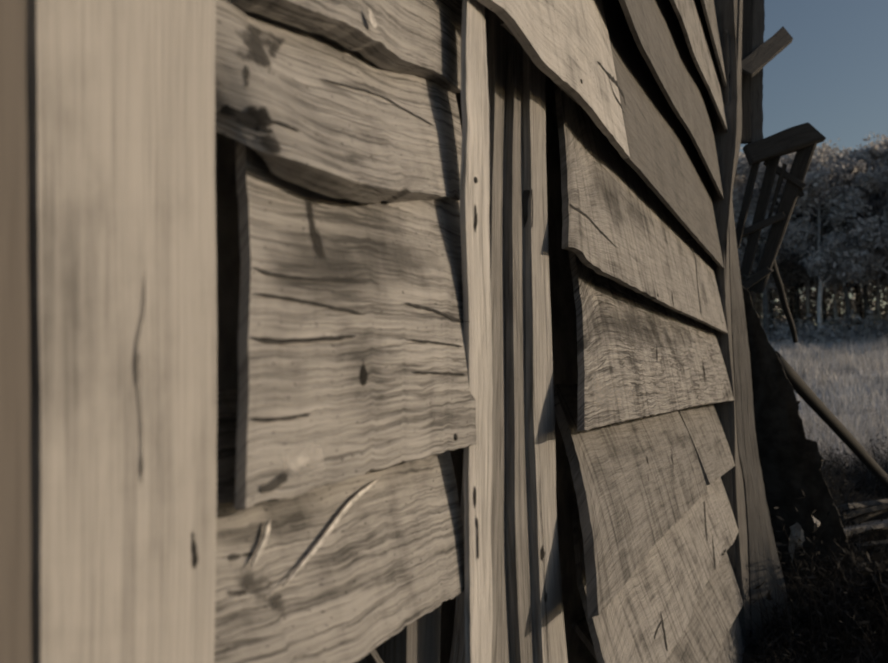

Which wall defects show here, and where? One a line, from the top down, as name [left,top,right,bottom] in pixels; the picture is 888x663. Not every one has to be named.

crack [135,275,146,476]